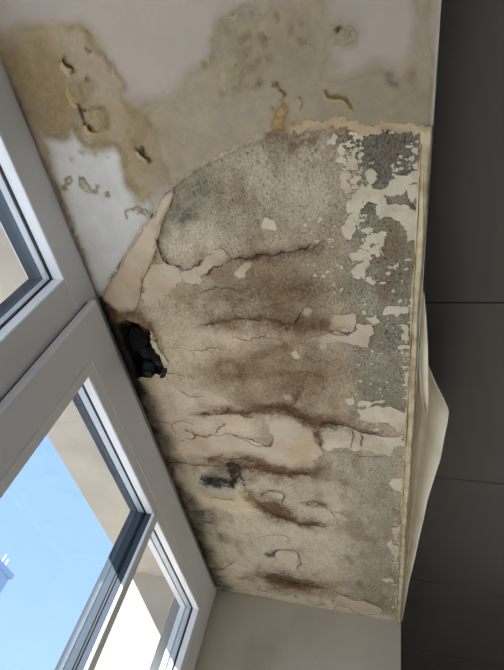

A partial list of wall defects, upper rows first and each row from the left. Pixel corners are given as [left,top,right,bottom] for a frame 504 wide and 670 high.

water stain [9,0,432,220]
crack [155,239,309,293]
water stain [100,297,158,413]
crack [199,310,303,341]
peeling [102,116,425,621]
water stain [199,463,245,488]
crack [170,455,315,478]
crack [164,399,385,457]
water stain [176,486,214,571]
crack [210,487,344,566]